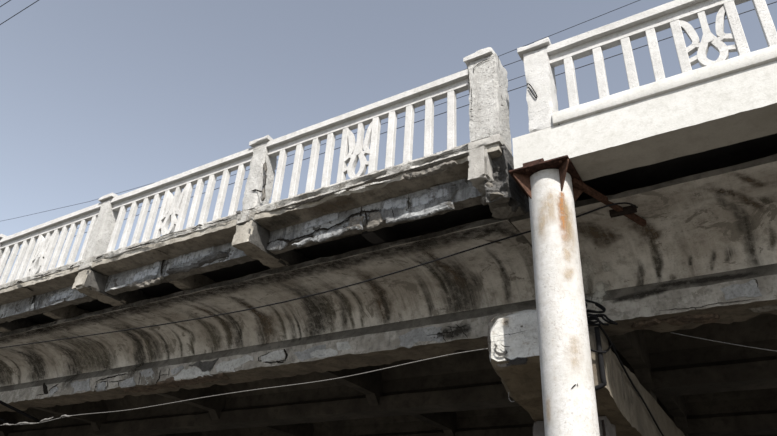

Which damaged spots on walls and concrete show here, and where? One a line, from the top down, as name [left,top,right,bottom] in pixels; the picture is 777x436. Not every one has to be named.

spalling [280,157,457,210]
spalling [478,144,526,218]
crack [267,194,409,244]
corrosion [548,192,572,230]
damp [578,226,615,244]
damp [615,189,772,301]
damp [0,218,515,352]
damp [123,327,169,378]
spalling [119,341,351,393]
peeling [399,326,443,348]
spalling [494,344,528,362]
damp [497,358,527,367]